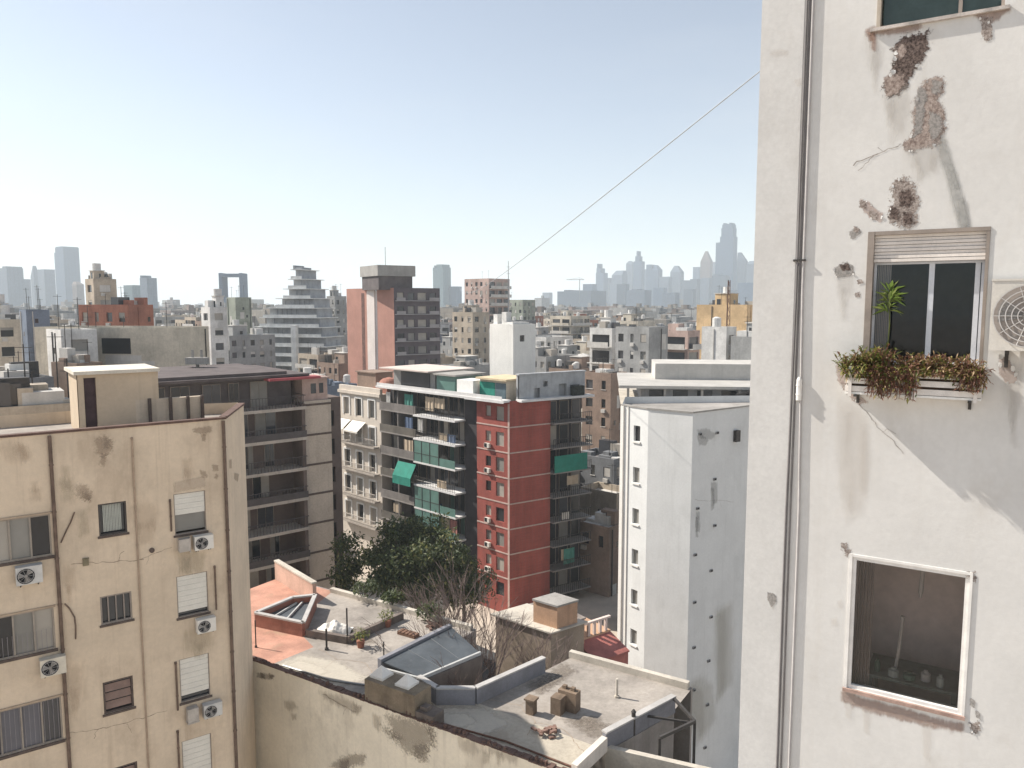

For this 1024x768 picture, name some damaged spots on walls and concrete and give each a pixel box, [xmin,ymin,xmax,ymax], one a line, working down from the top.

spalling [881,29,947,152]
crack [853,144,900,171]
peeling [859,176,921,230]
water stain [939,138,969,228]
spalling [833,262,863,297]